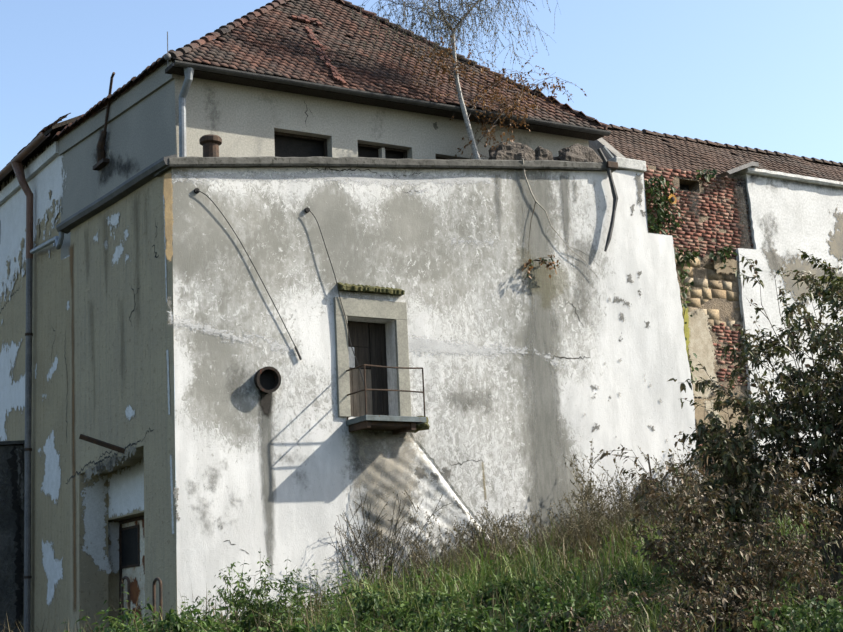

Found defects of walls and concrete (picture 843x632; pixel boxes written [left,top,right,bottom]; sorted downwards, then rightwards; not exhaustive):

peeling [0,155,67,303]
water stain [560,175,577,244]
peeling [713,258,739,274]
peeling [762,207,843,306]
peeling [0,338,25,441]
peeling [38,427,61,505]
peeling [80,441,144,574]
water stain [259,390,276,566]
water stain [516,174,565,537]
peeling [704,400,729,439]
peeling [41,539,63,607]
corrosion [130,549,145,626]